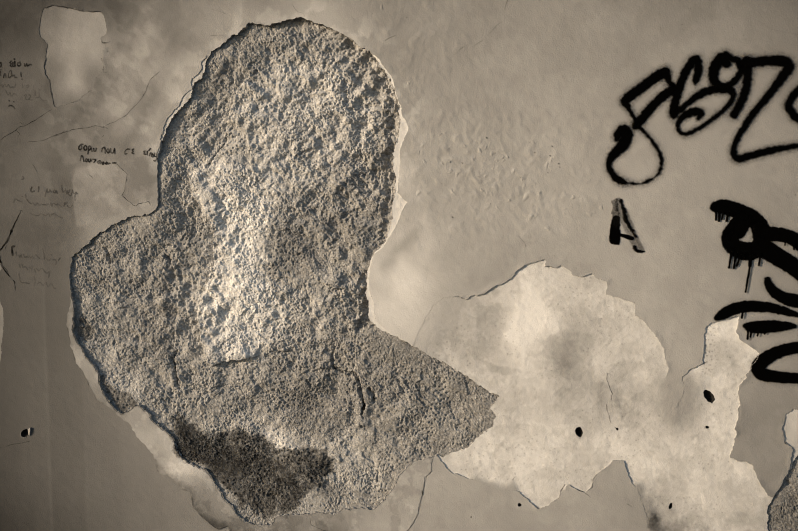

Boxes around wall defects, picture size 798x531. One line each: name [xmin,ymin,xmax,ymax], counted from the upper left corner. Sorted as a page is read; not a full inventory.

peeling [39,5,107,107]
crack [0,211,21,284]
spalling [66,17,499,531]
peeling [414,259,798,531]
water stain [174,415,332,518]